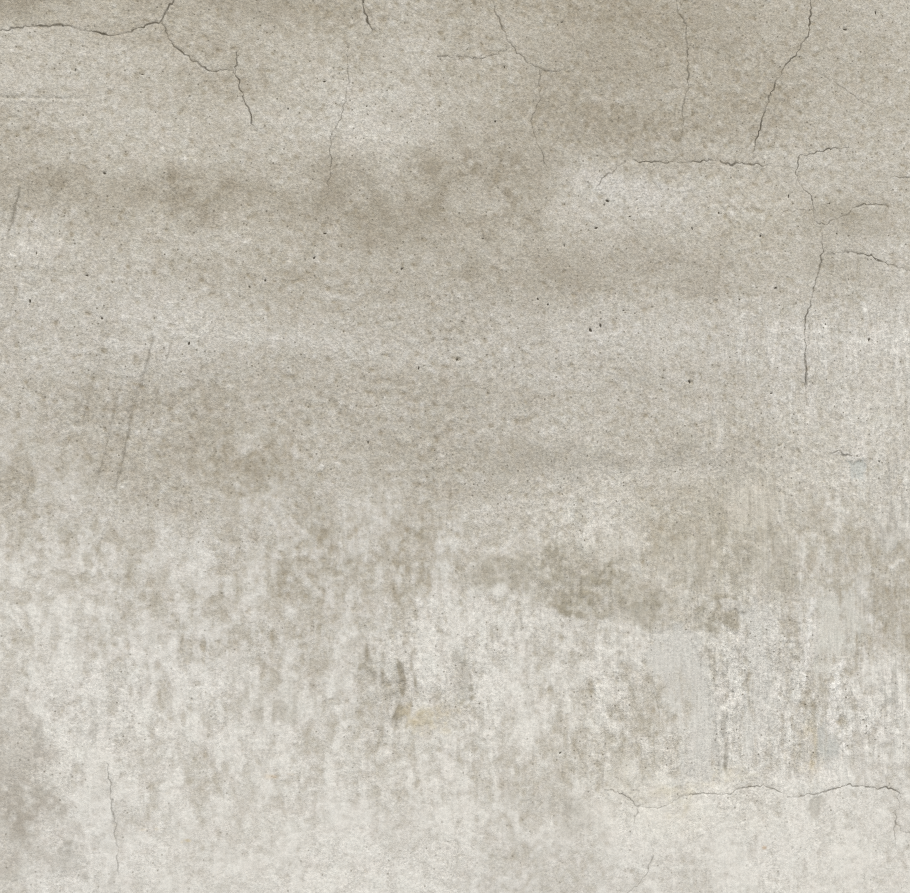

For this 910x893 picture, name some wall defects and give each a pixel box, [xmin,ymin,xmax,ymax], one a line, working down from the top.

crack [94,1,174,36]
damp [450,429,829,714]
damp [858,446,910,576]